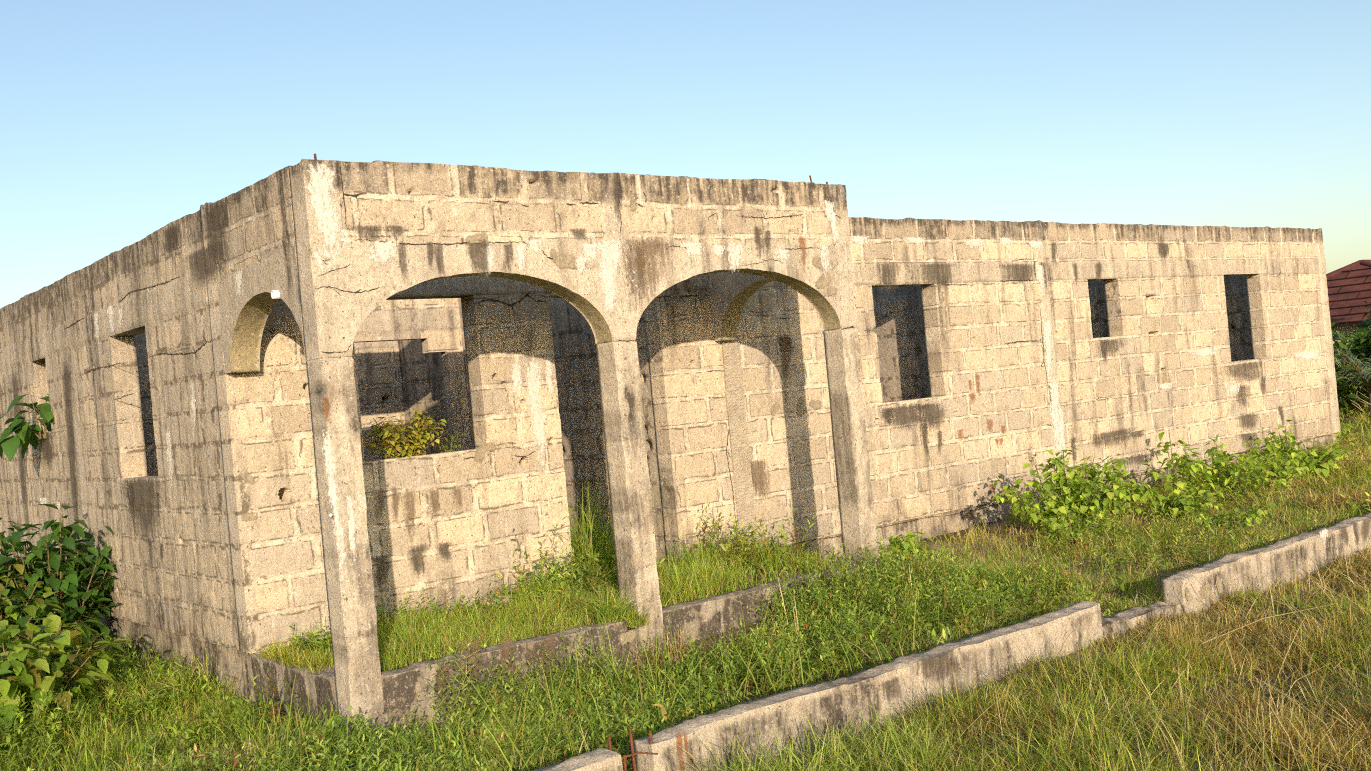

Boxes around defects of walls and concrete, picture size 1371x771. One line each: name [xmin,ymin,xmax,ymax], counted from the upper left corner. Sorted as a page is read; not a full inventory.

leakage [163,226,178,253]
leakage [189,203,227,283]
leakage [918,652,955,678]
leakage [883,678,900,699]